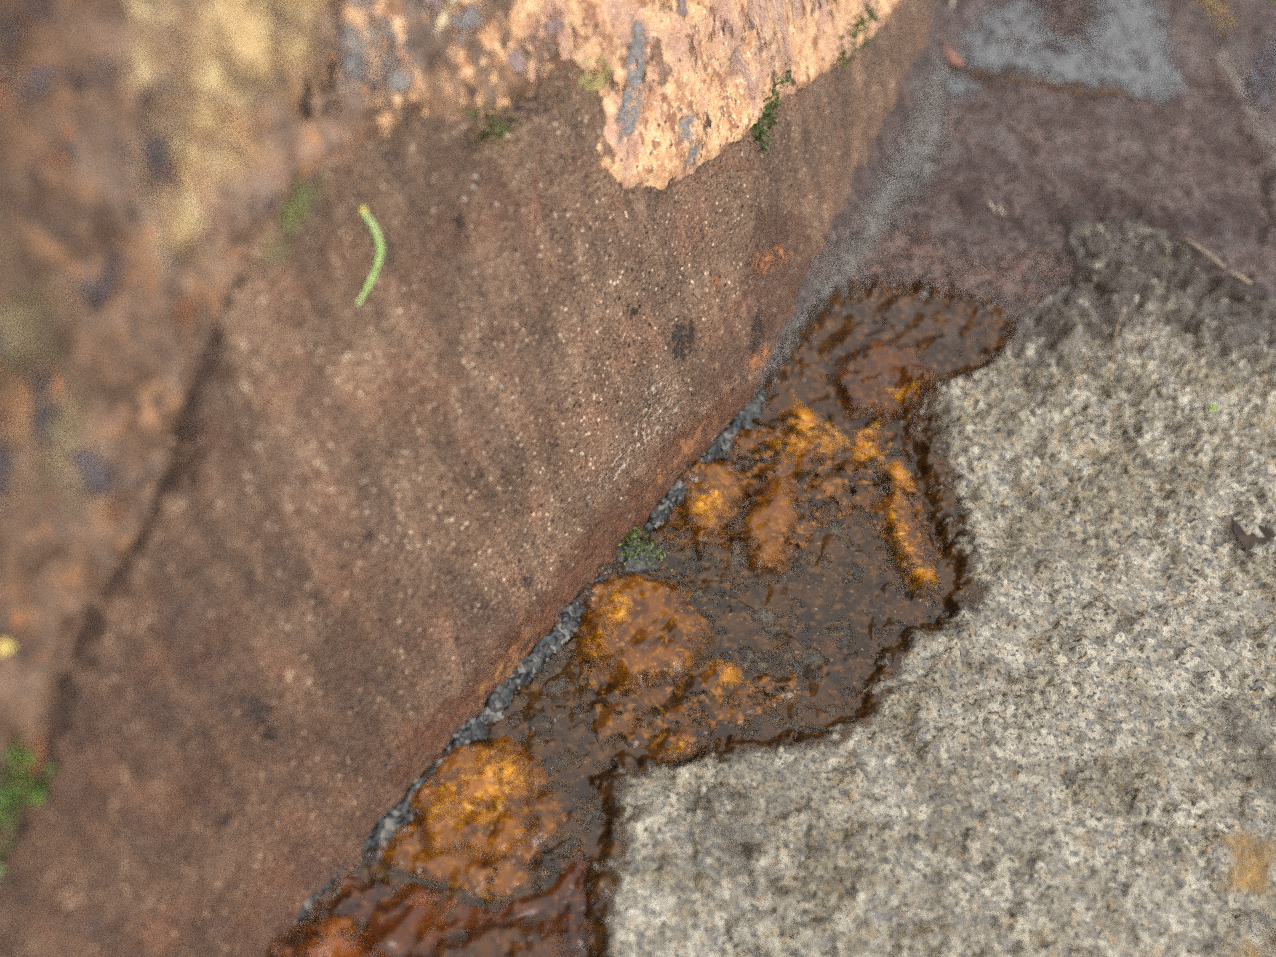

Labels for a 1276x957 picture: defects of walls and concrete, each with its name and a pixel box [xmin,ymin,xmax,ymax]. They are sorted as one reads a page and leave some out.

rust [0,0,673,857]
rust [292,224,1070,957]
rust [648,101,764,188]
rust [685,0,847,106]